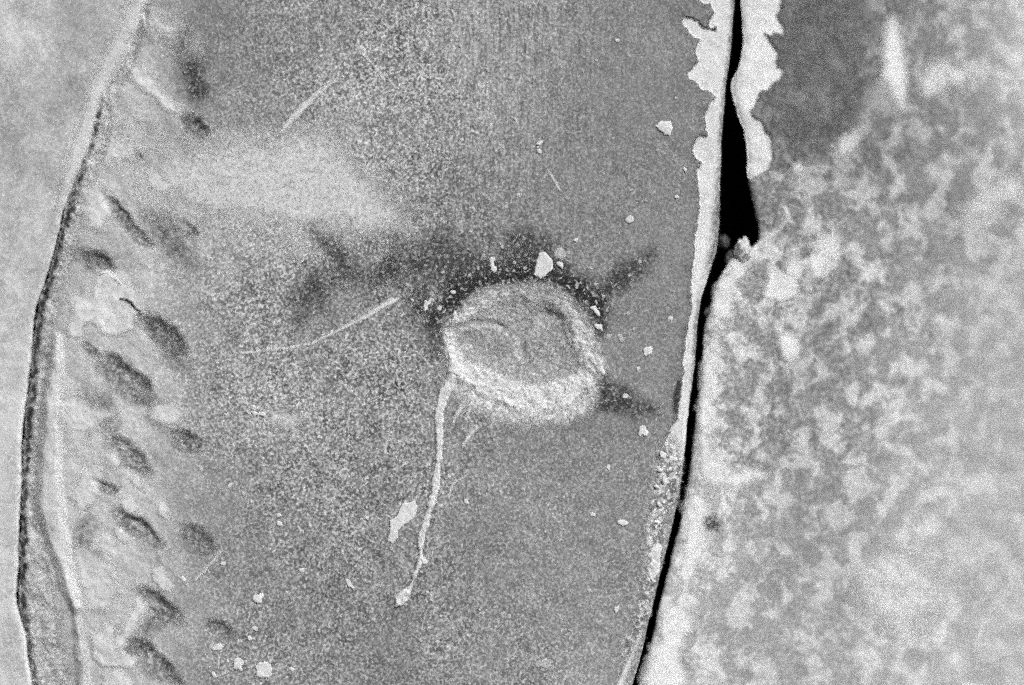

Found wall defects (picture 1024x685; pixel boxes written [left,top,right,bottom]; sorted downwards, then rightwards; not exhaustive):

water stain [107,123,654,592]
crack [633,0,759,685]
spalling [617,0,784,685]